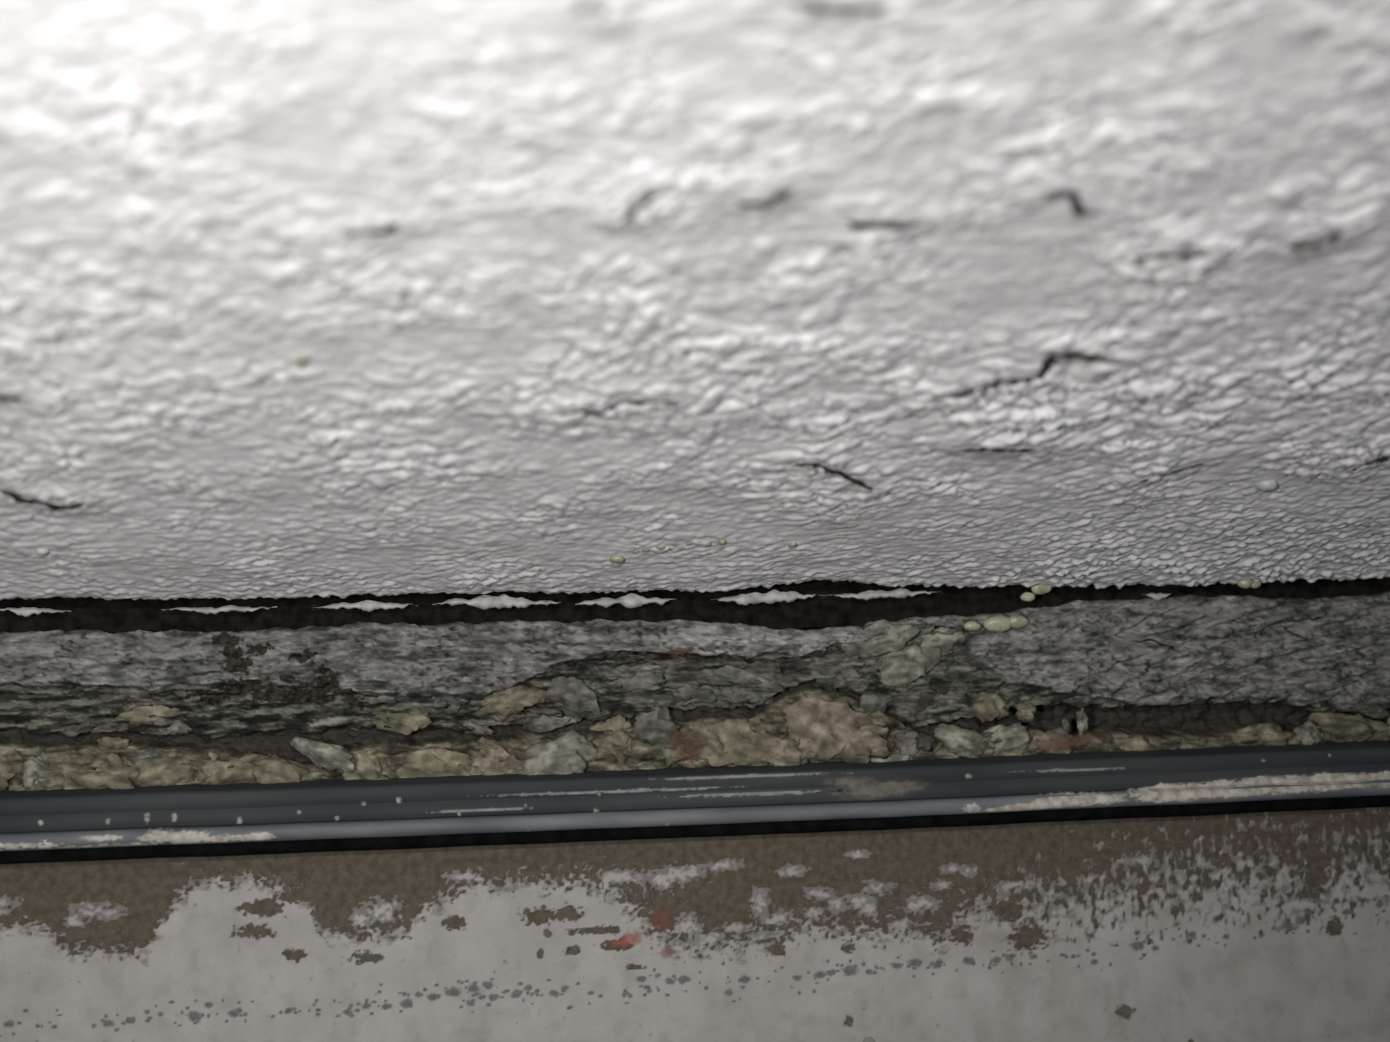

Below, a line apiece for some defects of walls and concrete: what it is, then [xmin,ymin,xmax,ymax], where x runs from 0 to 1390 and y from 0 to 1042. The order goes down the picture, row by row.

crack [0,577,1390,682]
spalling [0,617,1153,792]
spalling [1236,678,1390,746]